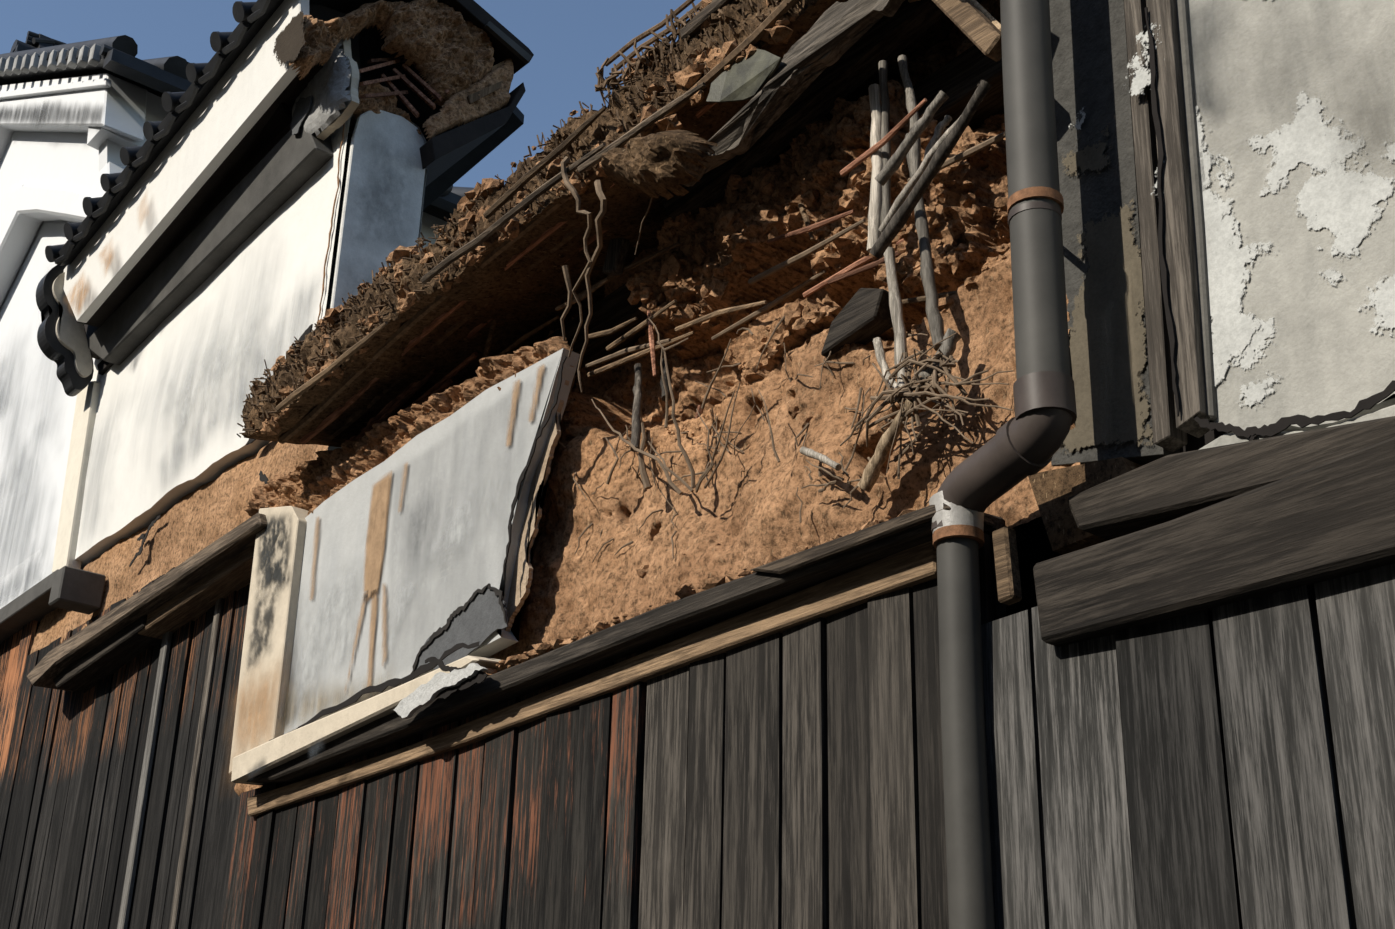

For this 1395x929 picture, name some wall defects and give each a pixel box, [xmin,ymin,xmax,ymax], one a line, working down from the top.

flaking render [273,11,306,66]
flaking render [290,37,360,140]
flaking render [1125,24,1160,96]
flaking render [1195,106,1281,409]
flaking render [1245,91,1395,286]
flaking render [391,365,574,719]